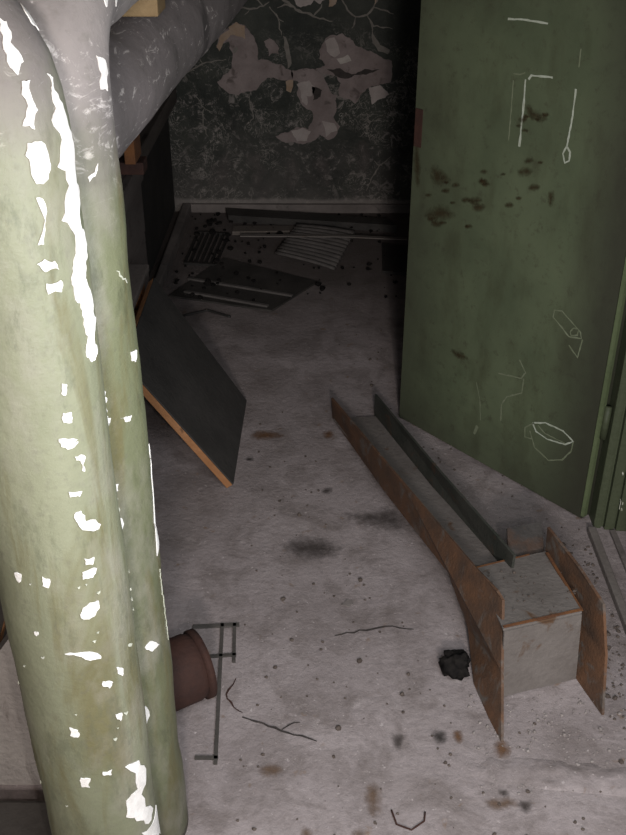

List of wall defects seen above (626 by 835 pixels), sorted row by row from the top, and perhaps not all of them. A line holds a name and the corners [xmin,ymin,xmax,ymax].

crack [242,0,393,35]
peeling [216,22,392,144]